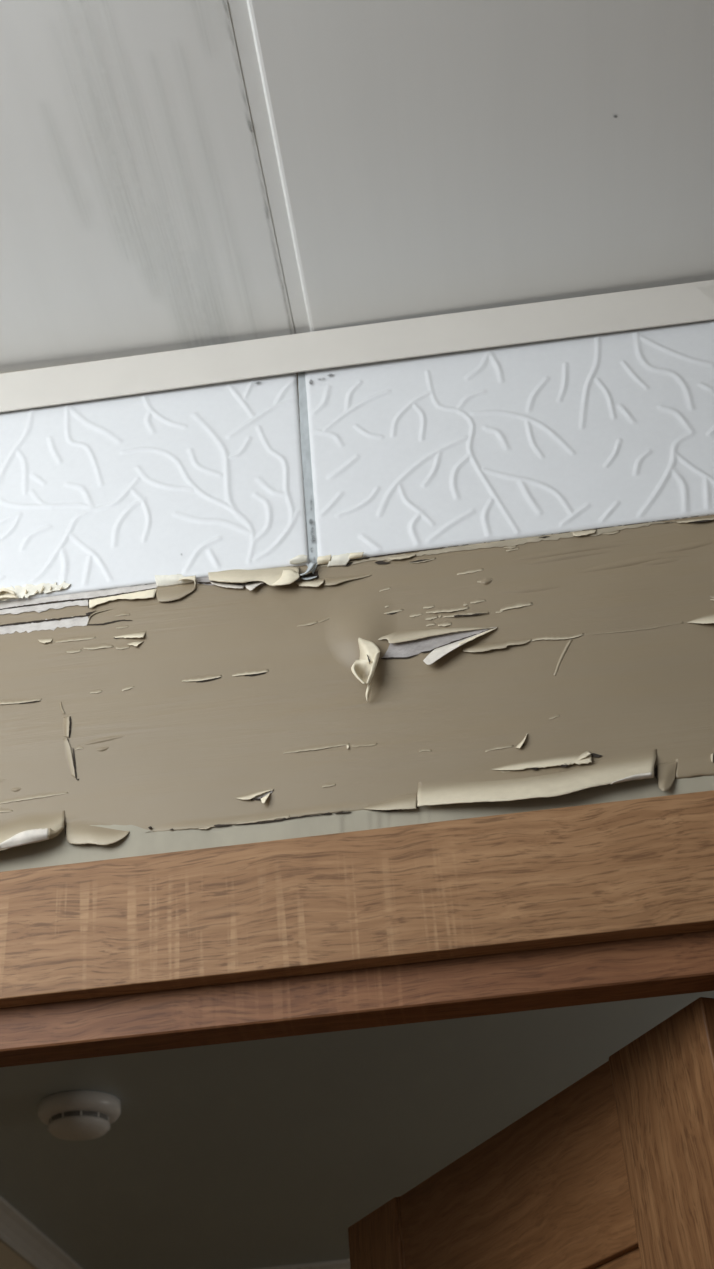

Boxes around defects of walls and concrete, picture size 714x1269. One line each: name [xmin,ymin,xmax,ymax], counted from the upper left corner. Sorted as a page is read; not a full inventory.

peeling [0,516,714,701]
peeling [0,810,130,851]
peeling [148,733,714,832]